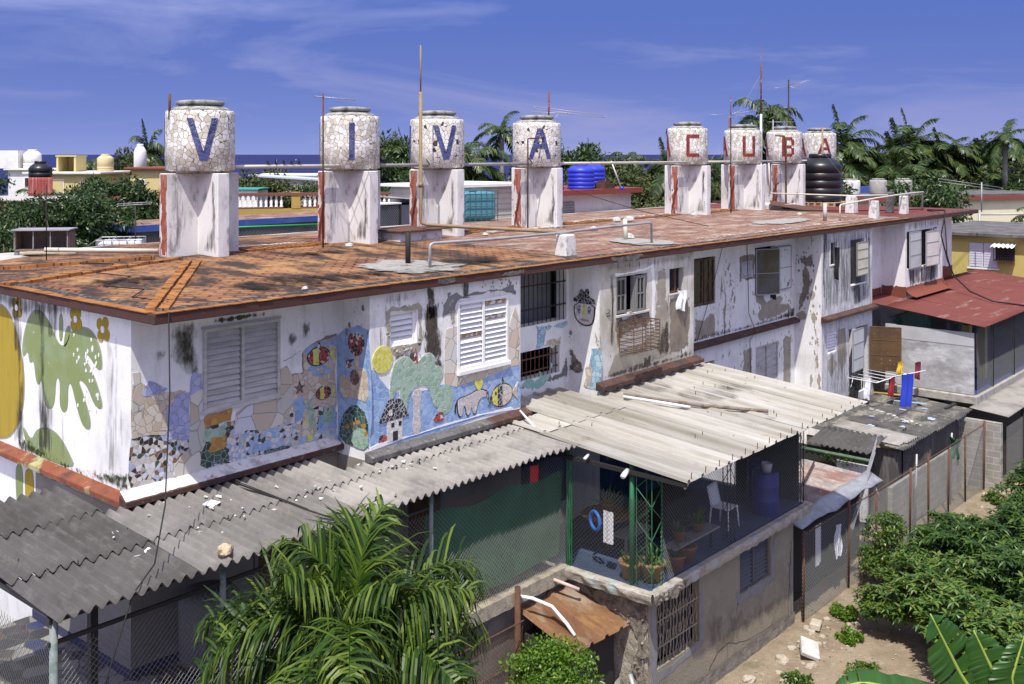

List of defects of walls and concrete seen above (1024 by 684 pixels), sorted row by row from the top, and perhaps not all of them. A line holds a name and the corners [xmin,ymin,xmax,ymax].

leakage [176,325,194,367]
leakage [396,288,441,366]
peeling [595,247,846,390]